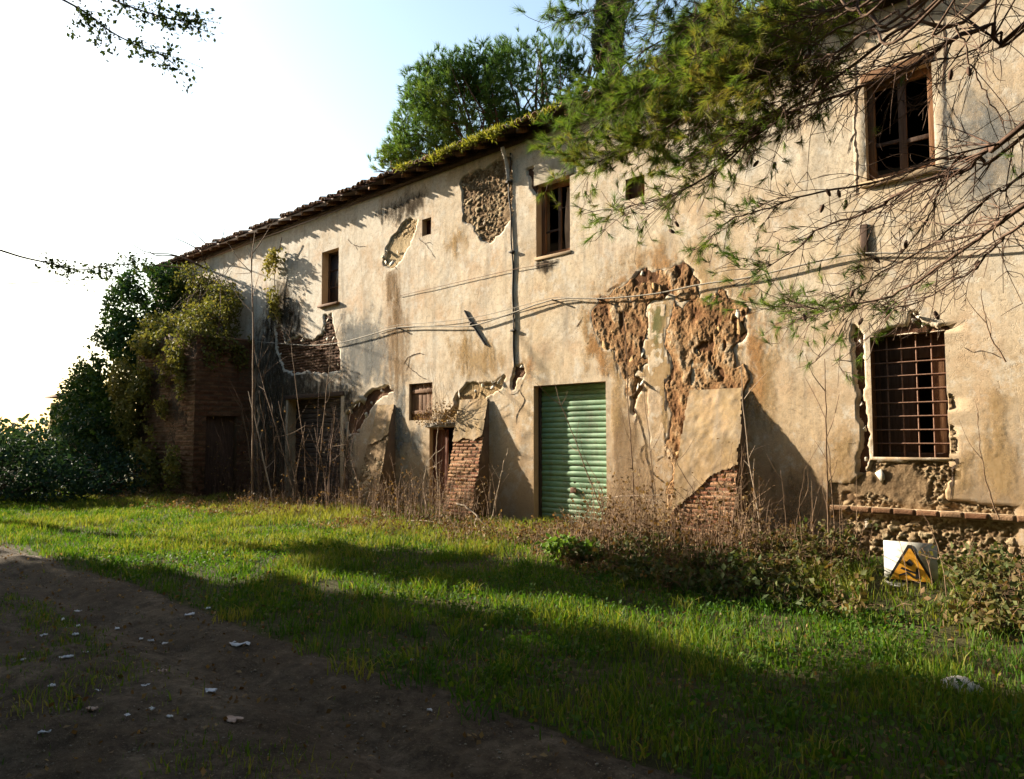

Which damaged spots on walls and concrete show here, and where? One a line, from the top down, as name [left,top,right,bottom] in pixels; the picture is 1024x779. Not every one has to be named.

flaking render [461,155,514,243]
flaking render [382,219,418,268]
flaking render [276,314,342,375]
flaking render [348,386,394,434]
flaking render [442,365,526,422]
flaking render [592,262,751,511]
flaking render [830,457,1019,564]